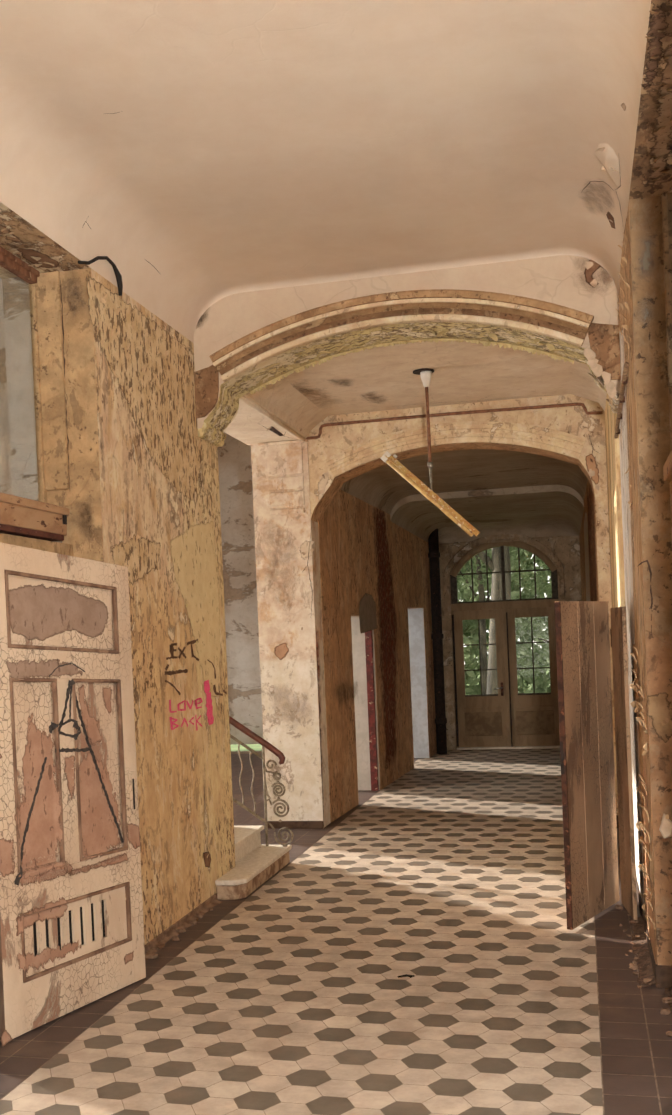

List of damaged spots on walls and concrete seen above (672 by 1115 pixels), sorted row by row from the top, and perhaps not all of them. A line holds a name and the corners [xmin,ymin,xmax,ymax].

peeling [641,2,672,188]
spalling [0,225,59,268]
peeling [606,211,633,359]
peeling [243,328,617,405]
peeling [5,658,83,680]
peeling [0,713,128,887]
peeling [630,643,672,963]
peeling [16,897,68,936]
peeling [15,940,82,973]
peeling [0,1030,13,1047]